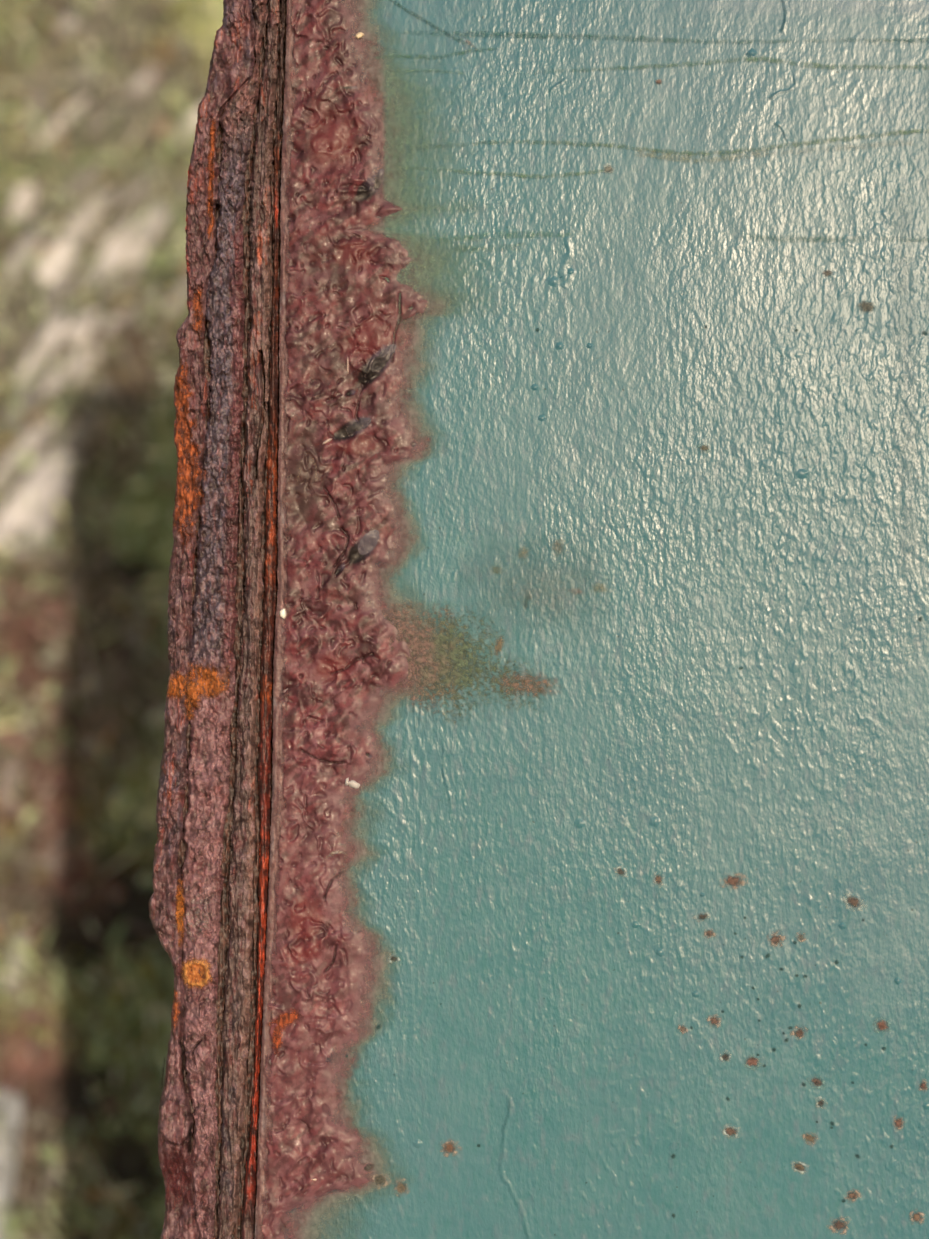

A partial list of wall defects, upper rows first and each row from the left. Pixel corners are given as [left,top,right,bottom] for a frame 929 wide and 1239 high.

corrosion [148,0,548,1239]
peeling [345,778,360,789]
corrosion [724,874,745,889]
corrosion [771,932,806,946]
corrosion [829,1218,848,1233]